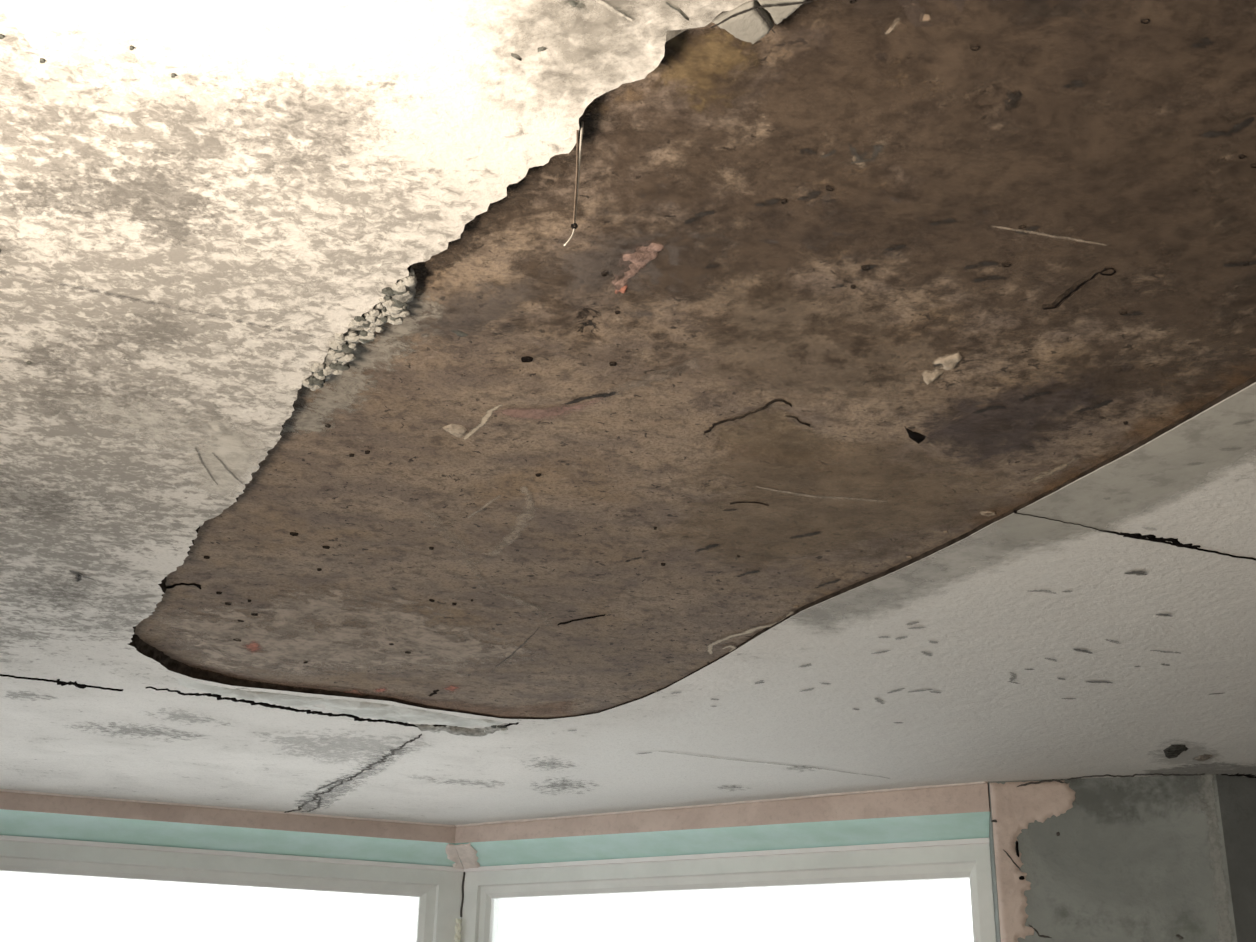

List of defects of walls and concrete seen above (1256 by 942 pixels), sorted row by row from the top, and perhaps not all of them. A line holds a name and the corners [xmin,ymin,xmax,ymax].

crack [1014,510,1256,561]
water stain [163,587,531,676]
water stain [707,612,794,654]
crack [0,674,458,813]